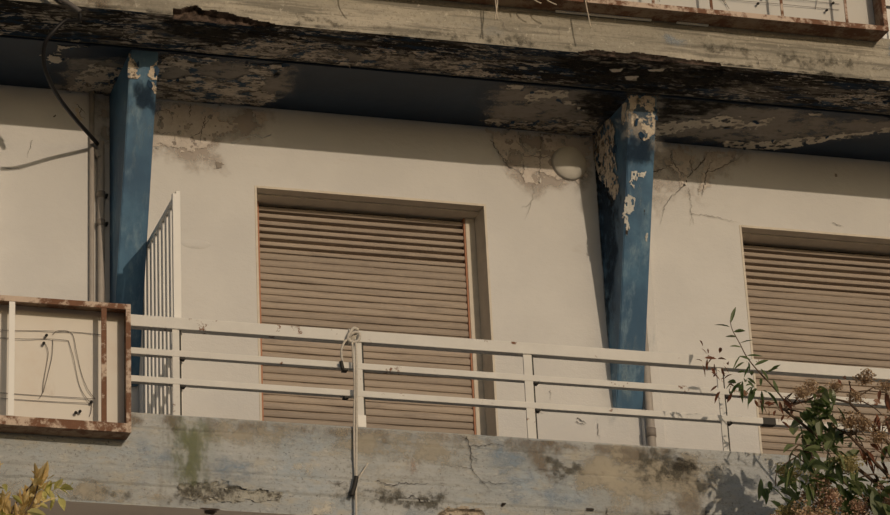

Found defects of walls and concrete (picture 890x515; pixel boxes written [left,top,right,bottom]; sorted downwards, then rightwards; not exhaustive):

peeling [39,5,890,235]
crack [653,149,740,226]
spalling [177,480,283,515]
spalling [438,506,485,515]